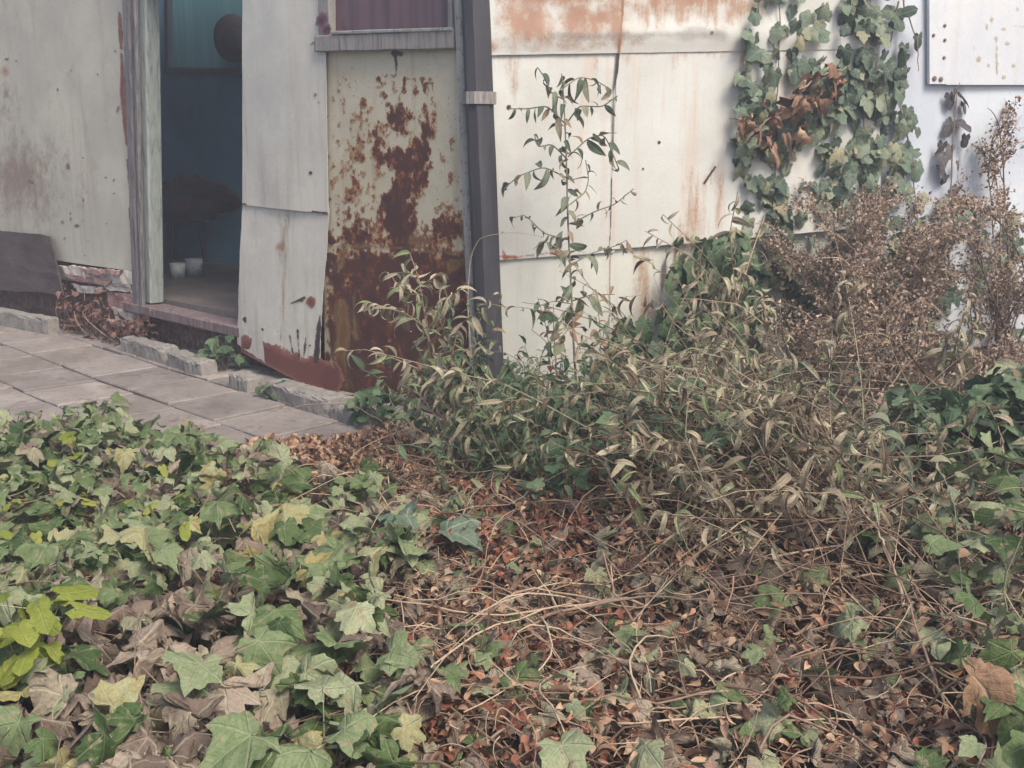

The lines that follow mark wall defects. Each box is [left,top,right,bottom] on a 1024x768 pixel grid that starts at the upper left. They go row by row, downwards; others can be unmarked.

rust [499,0,623,40]
rust [635,0,751,22]
rust [306,50,475,424]